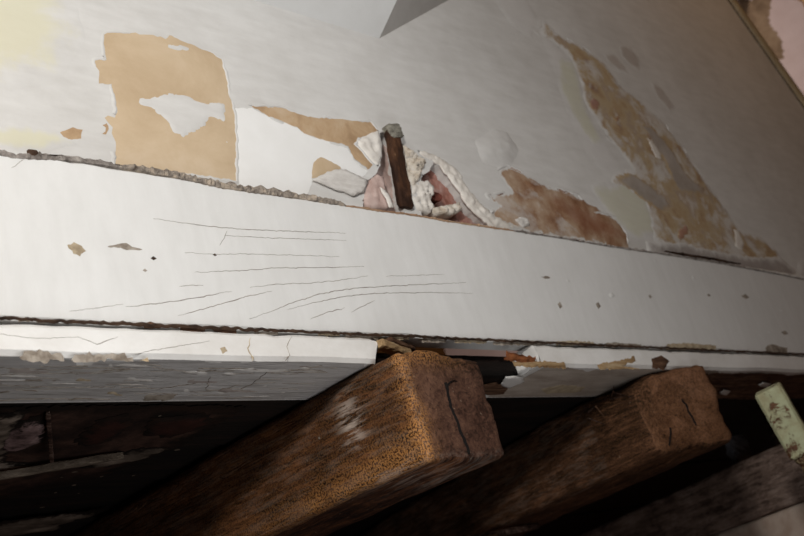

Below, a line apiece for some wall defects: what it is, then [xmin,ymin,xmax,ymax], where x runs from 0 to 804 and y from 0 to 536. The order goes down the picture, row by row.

flaking render [738,0,784,60]
peeling [92,29,396,212]
peeling [533,20,779,258]
damp [538,30,804,276]
peeling [403,145,629,248]
peeling [20,349,150,368]
spalling [422,338,546,346]
peeling [597,356,639,370]
spalling [651,343,716,371]